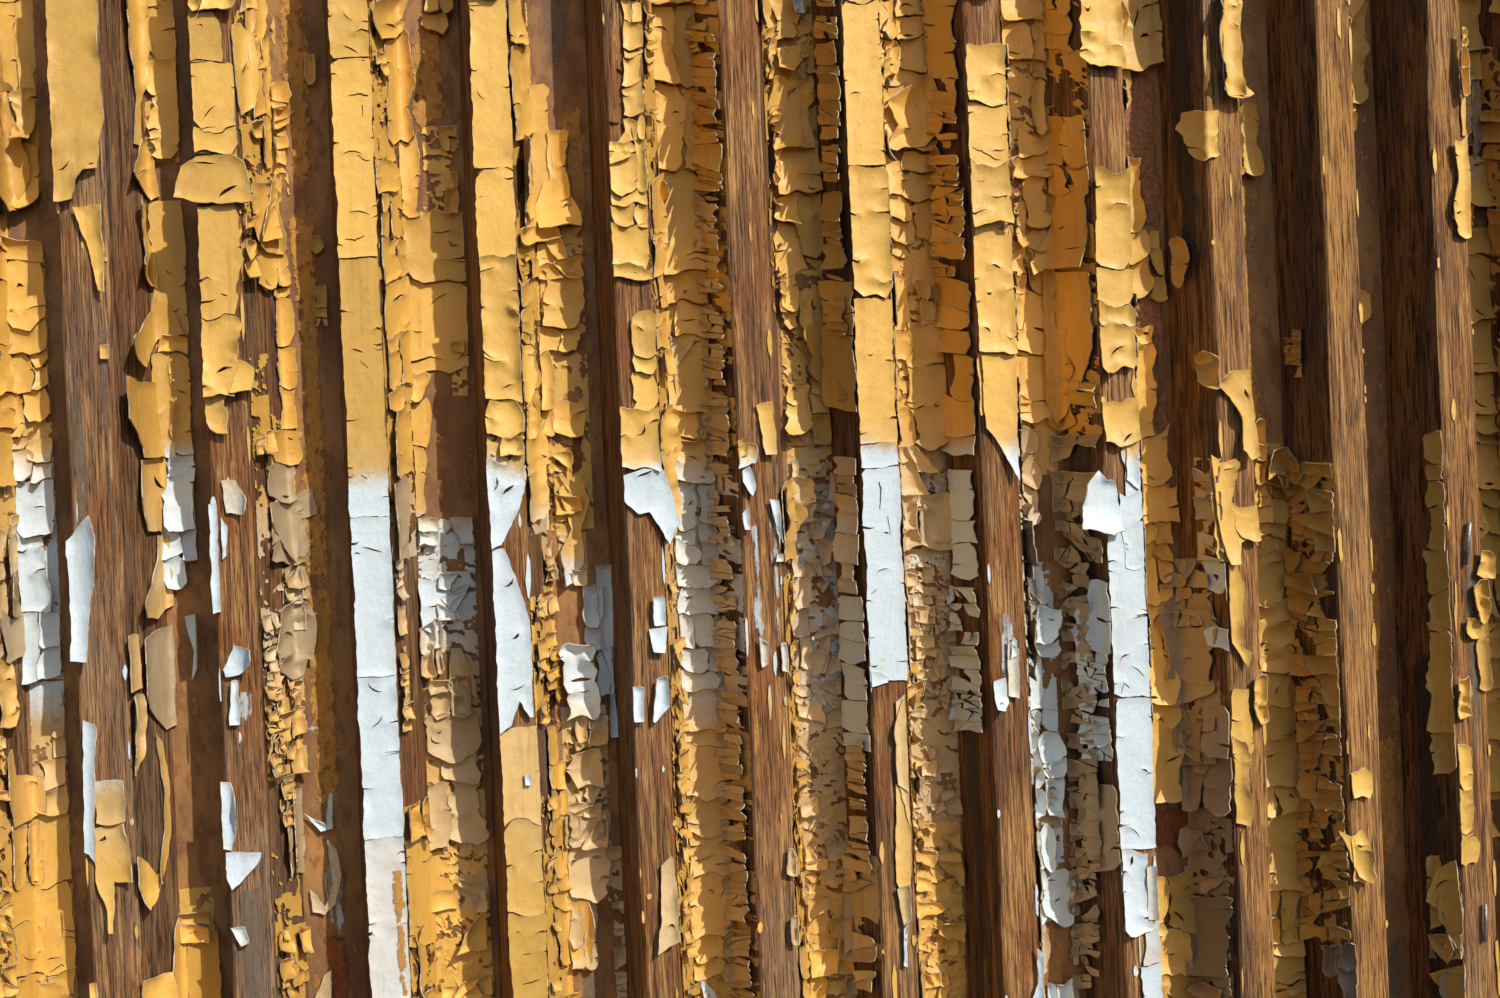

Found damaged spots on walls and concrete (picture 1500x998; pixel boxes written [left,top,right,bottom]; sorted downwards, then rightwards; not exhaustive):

corrosion [1124,77,1160,227]
corrosion [1136,291,1168,430]
peeling [0,0,342,998]
peeling [303,0,1373,998]
peeling [1422,0,1500,896]
peeling [1371,619,1380,671]
peeling [1426,855,1467,998]